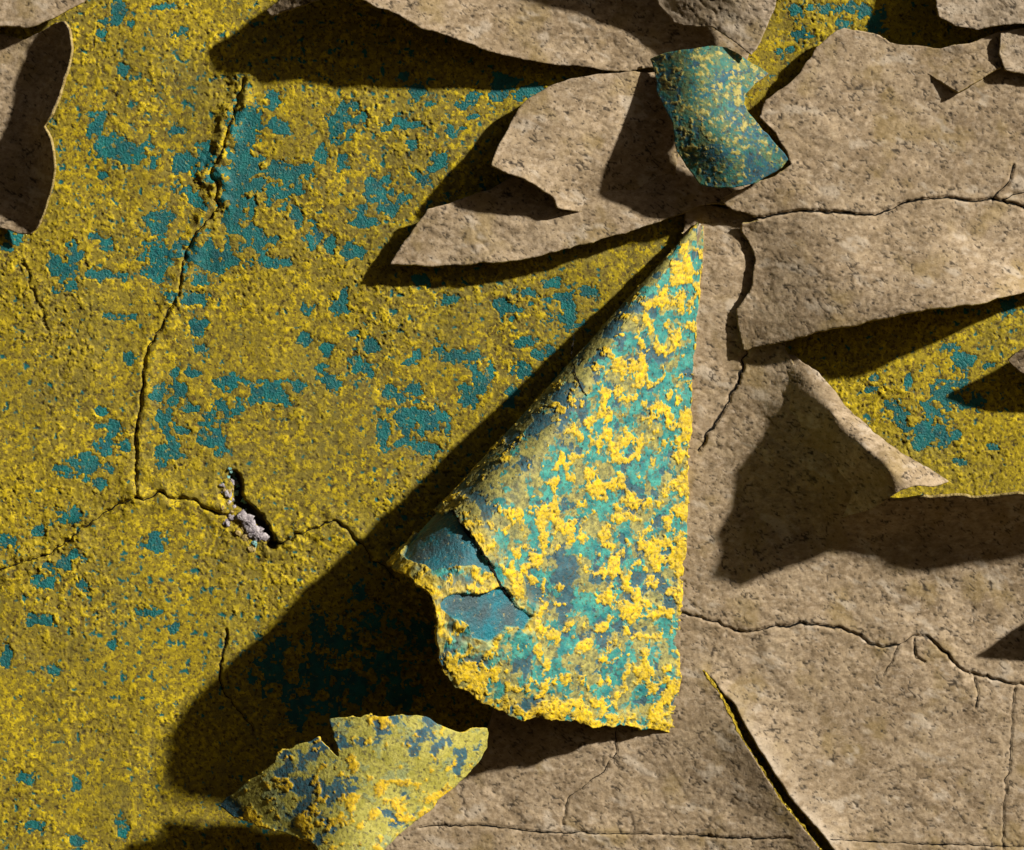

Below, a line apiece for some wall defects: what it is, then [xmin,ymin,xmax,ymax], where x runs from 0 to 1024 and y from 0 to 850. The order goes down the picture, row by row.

peeling [266,0,319,17]
peeling [0,0,88,252]
crack [752,165,1024,219]
crack [0,80,244,570]
crack [277,520,397,579]
spalling [146,330,556,553]
peeling [363,0,1024,850]
crack [698,353,748,450]
crack [424,728,790,840]
crack [681,612,1024,850]